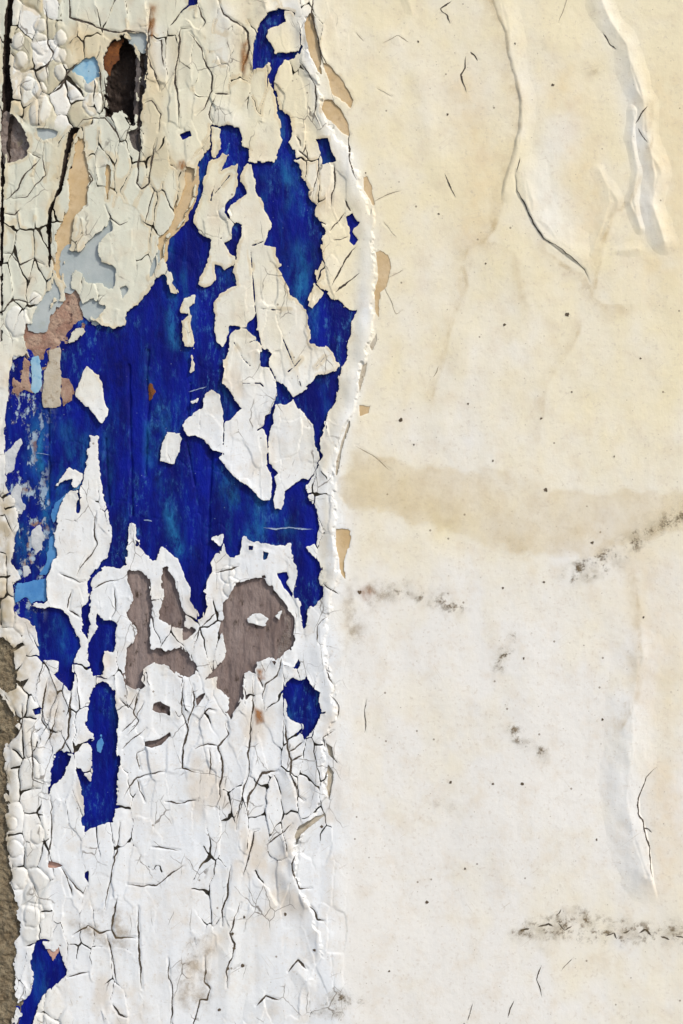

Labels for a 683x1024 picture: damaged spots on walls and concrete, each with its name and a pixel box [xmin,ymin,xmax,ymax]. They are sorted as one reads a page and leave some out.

crack [0,0,251,341]
peeling [346,214,360,245]
peeling [363,172,375,205]
crack [516,160,588,276]
peeling [0,8,357,832]
peeling [336,405,370,475]
peeling [358,363,367,390]
spalling [0,637,67,1024]
crack [14,683,181,982]
crack [120,659,339,1024]
peeling [295,811,326,844]
crack [637,769,654,874]